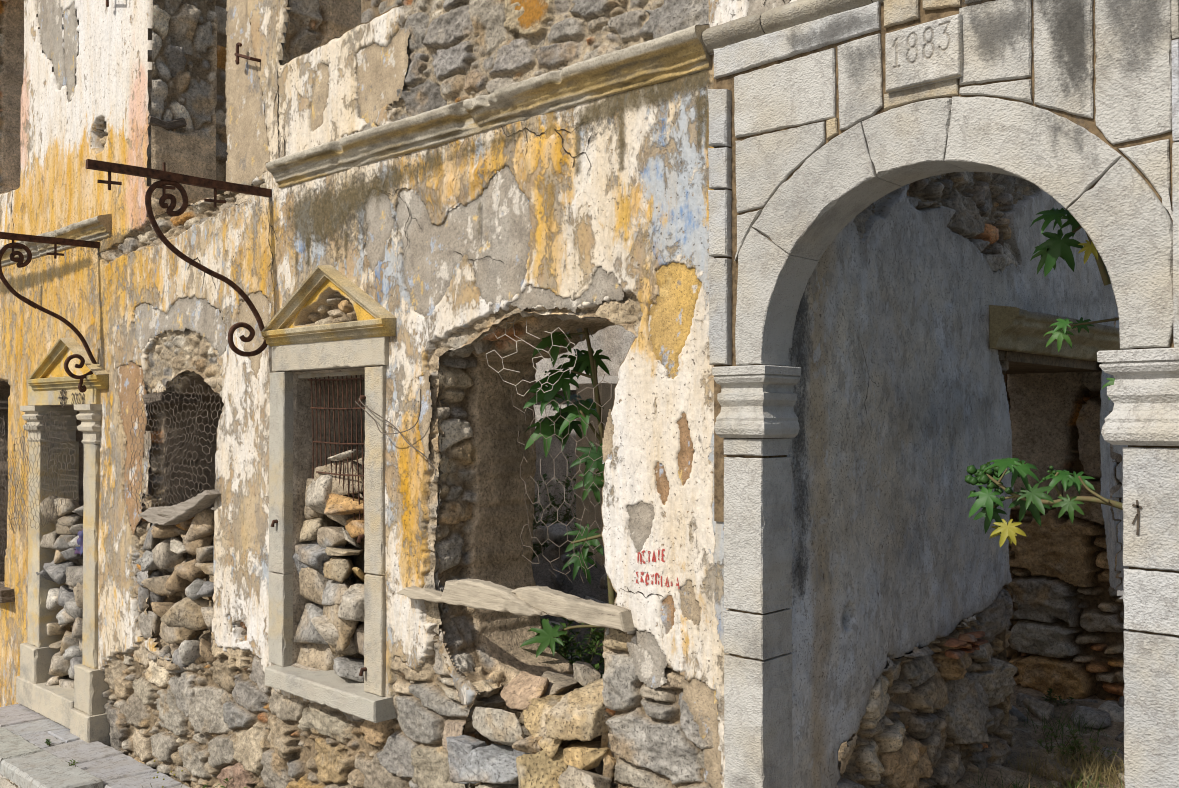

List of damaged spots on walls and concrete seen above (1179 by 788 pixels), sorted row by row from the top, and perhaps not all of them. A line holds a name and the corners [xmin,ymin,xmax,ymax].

peeling [37,0,79,102]
peeling [100,0,270,264]
spalling [343,0,709,137]
crack [501,122,594,174]
spalling [102,166,702,788]
spalling [602,580,723,788]